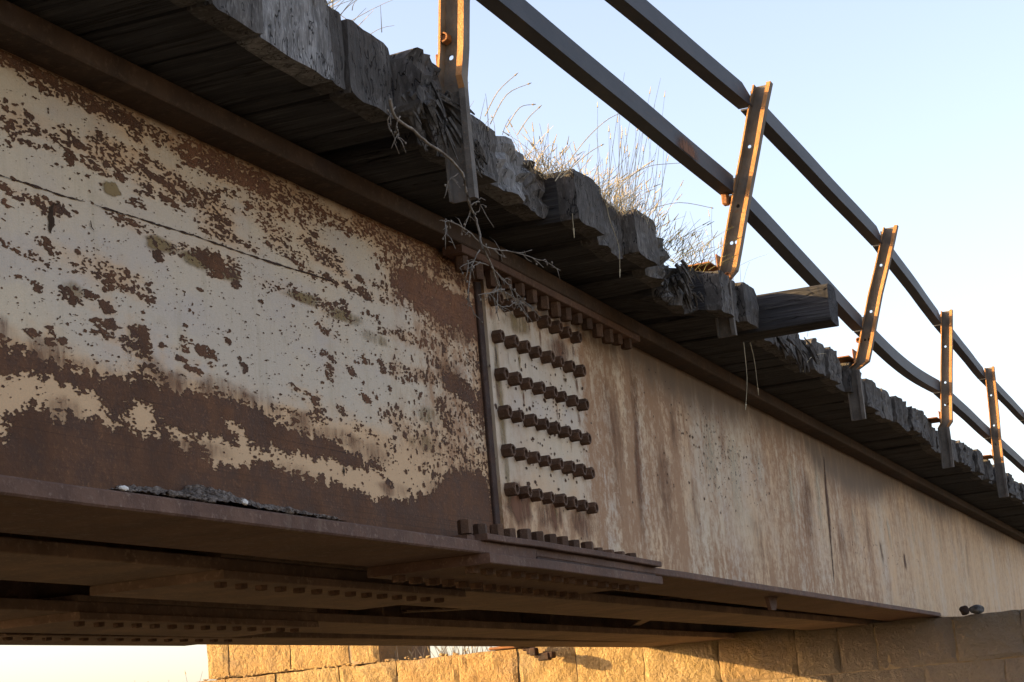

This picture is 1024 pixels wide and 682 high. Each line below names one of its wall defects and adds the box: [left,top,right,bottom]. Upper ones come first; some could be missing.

peeling [103,181,121,197]
crack [0,175,334,282]
corrosion [0,49,598,540]